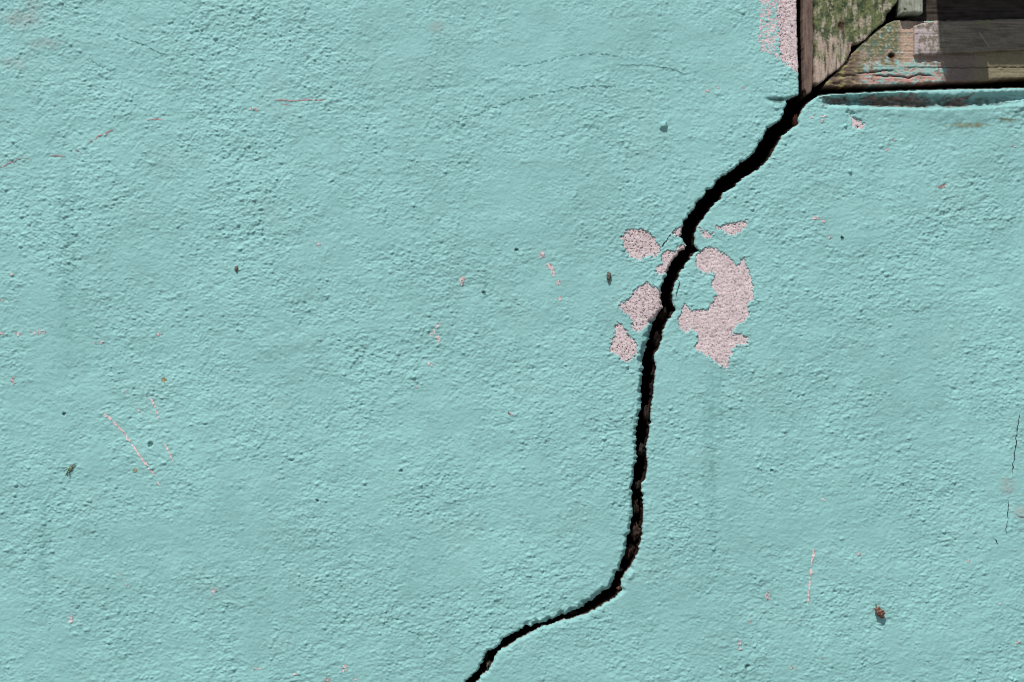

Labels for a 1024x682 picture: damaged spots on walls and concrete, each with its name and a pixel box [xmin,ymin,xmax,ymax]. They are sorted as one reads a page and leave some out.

crack [446,53,683,127]
peeling [757,0,798,74]
peeling [610,220,754,369]
crack [465,95,816,682]